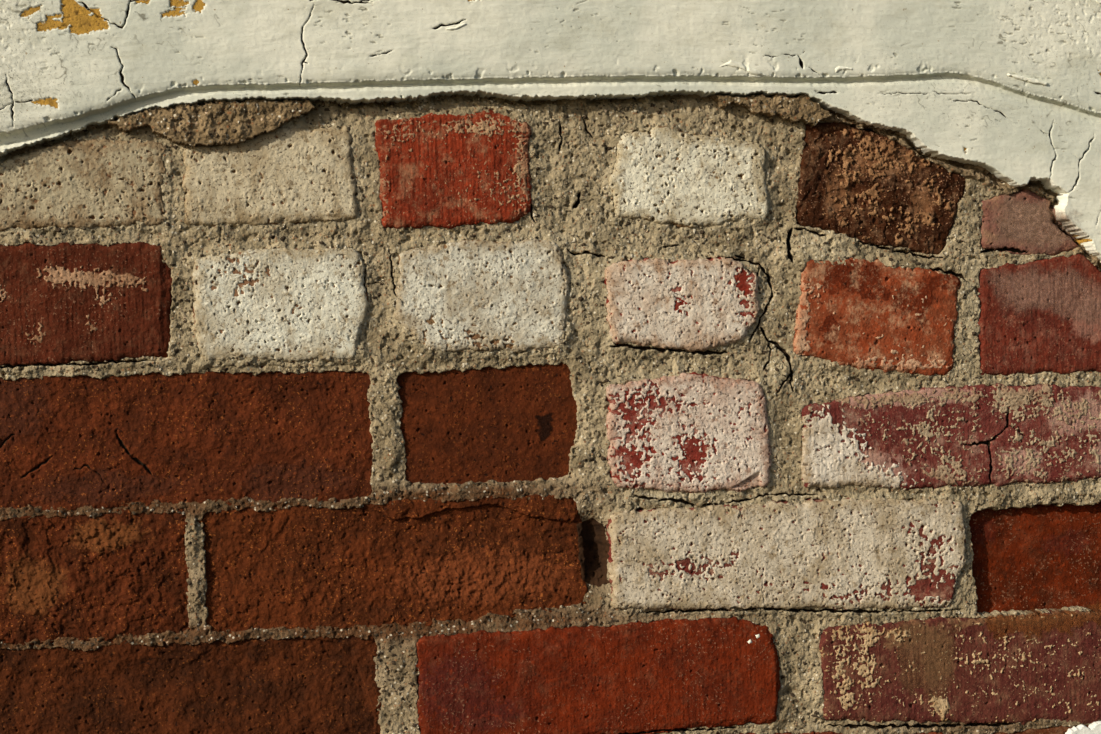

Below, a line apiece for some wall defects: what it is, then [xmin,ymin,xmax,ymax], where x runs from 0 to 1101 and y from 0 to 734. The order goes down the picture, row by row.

crack [0,75,33,121]
crack [79,0,137,101]
peeling [0,99,359,232]
peeling [609,126,769,228]
crack [1042,127,1094,196]
peeling [192,247,369,363]
peeling [394,238,571,353]
peeling [604,257,760,352]
crack [725,255,793,394]
crack [116,433,153,476]
crack [964,408,1025,485]
peeling [576,372,1101,724]